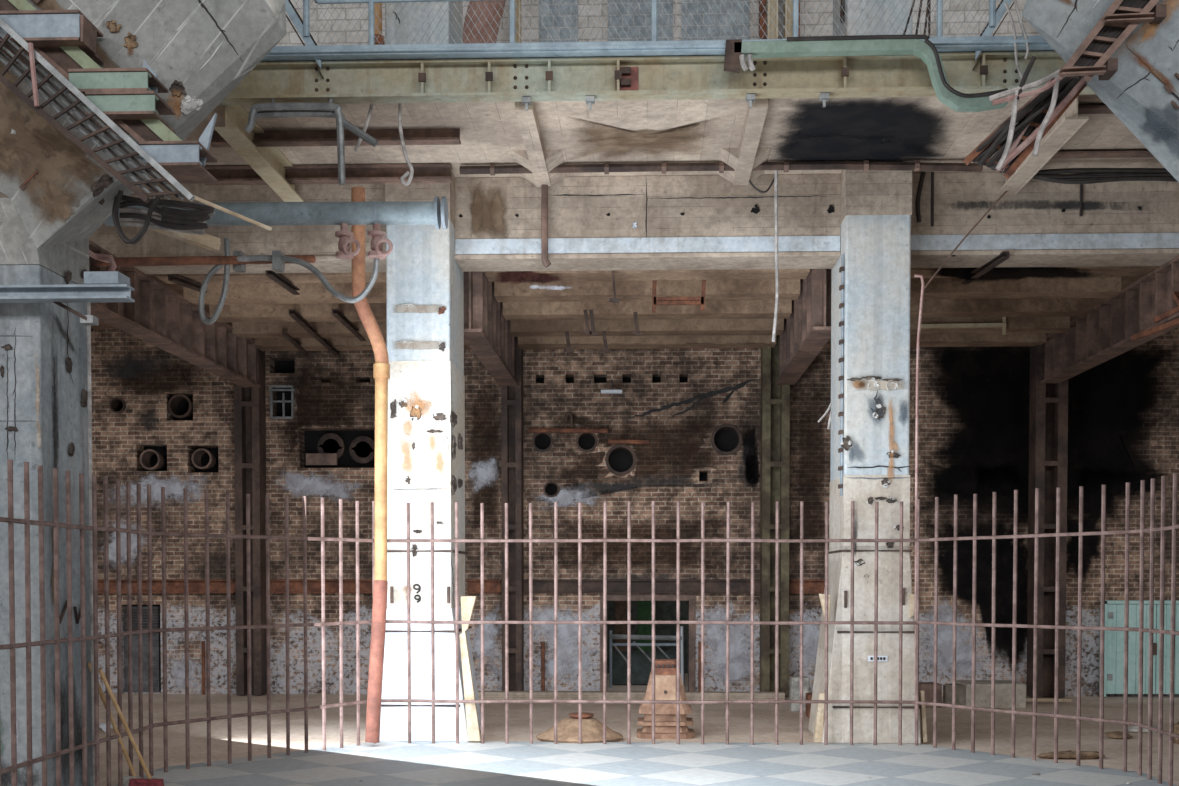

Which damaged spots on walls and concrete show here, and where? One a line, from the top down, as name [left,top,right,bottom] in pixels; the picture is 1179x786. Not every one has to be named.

crack [198,0,243,62]
crack [1056,0,1078,38]
spalling [169,80,203,116]
crack [1118,45,1179,100]
corrosion [1138,55,1174,90]
damp [578,119,705,157]
damp [779,134,935,162]
peeling [847,376,904,419]
corrosion [402,397,427,468]
spalling [390,398,463,459]
damp [1073,357,1163,497]
damp [997,538,1028,664]